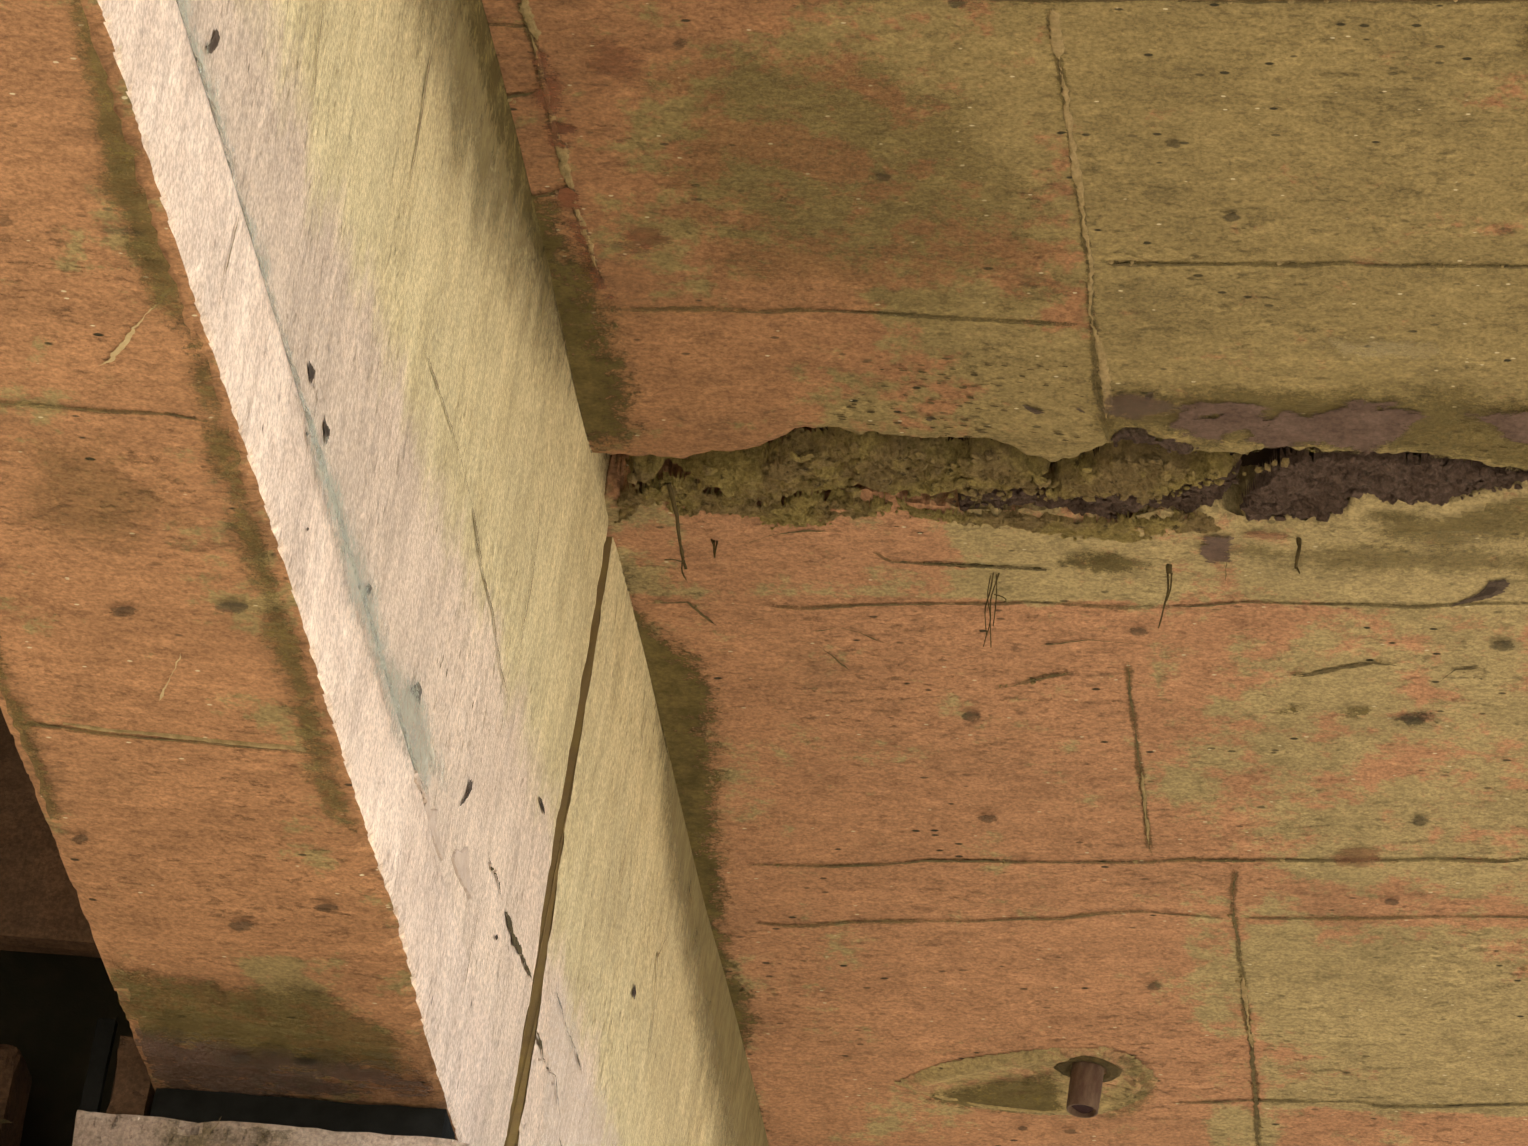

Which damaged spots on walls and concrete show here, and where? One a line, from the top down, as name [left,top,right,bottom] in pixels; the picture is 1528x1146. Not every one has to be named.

crack [646,600,766,625]
crack [749,530,832,543]
spalling [837,356,1085,448]
spalling [617,399,1528,563]
crack [747,542,1528,1146]
crack [461,859,582,1146]